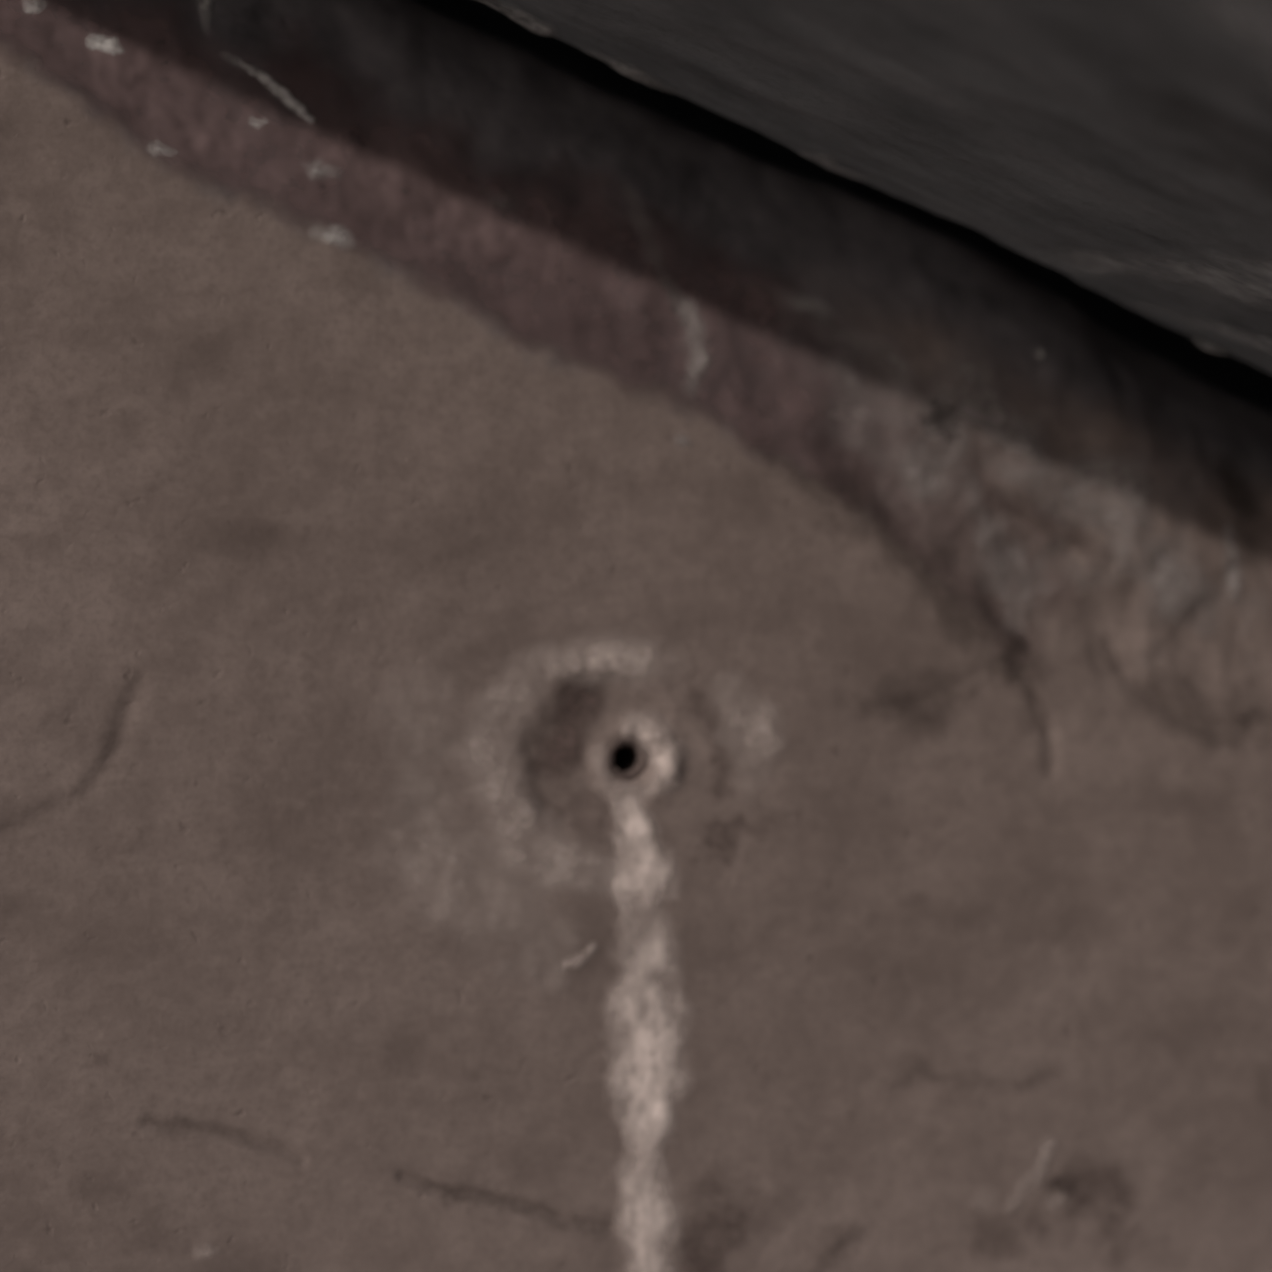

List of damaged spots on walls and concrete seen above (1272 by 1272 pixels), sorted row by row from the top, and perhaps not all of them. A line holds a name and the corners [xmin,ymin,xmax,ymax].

leakage [623,715,681,794]
leakage [614,797,671,903]
leakage [613,938,681,1272]